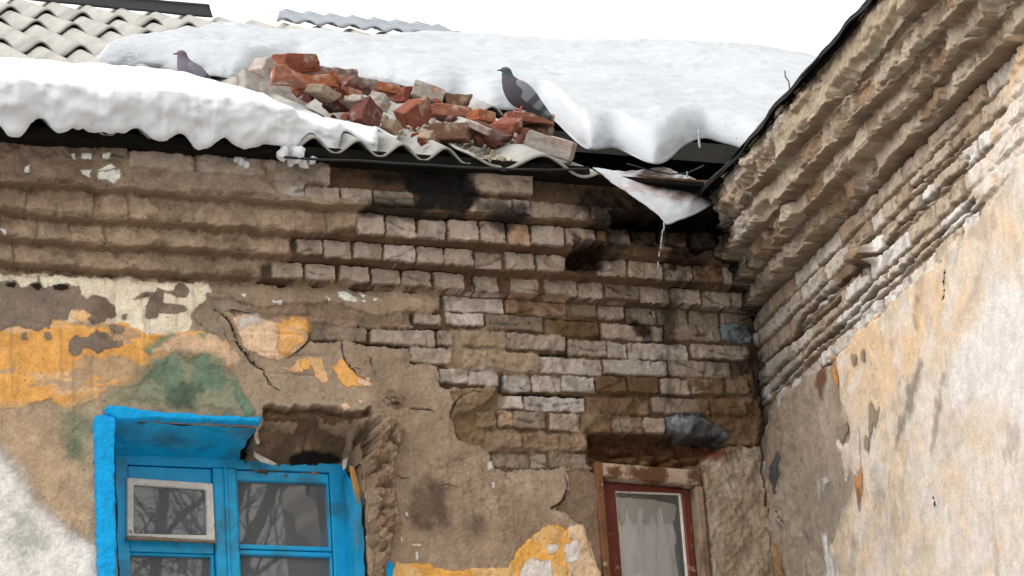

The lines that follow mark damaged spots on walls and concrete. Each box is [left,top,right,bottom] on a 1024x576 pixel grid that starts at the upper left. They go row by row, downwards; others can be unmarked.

damp [363,172,527,233]
peeling [0,276,127,356]
crack [214,309,280,391]
peeling [135,283,377,388]
spalling [245,400,365,477]
peeling [665,412,730,449]
peeling [836,402,879,481]
peeling [392,524,601,576]